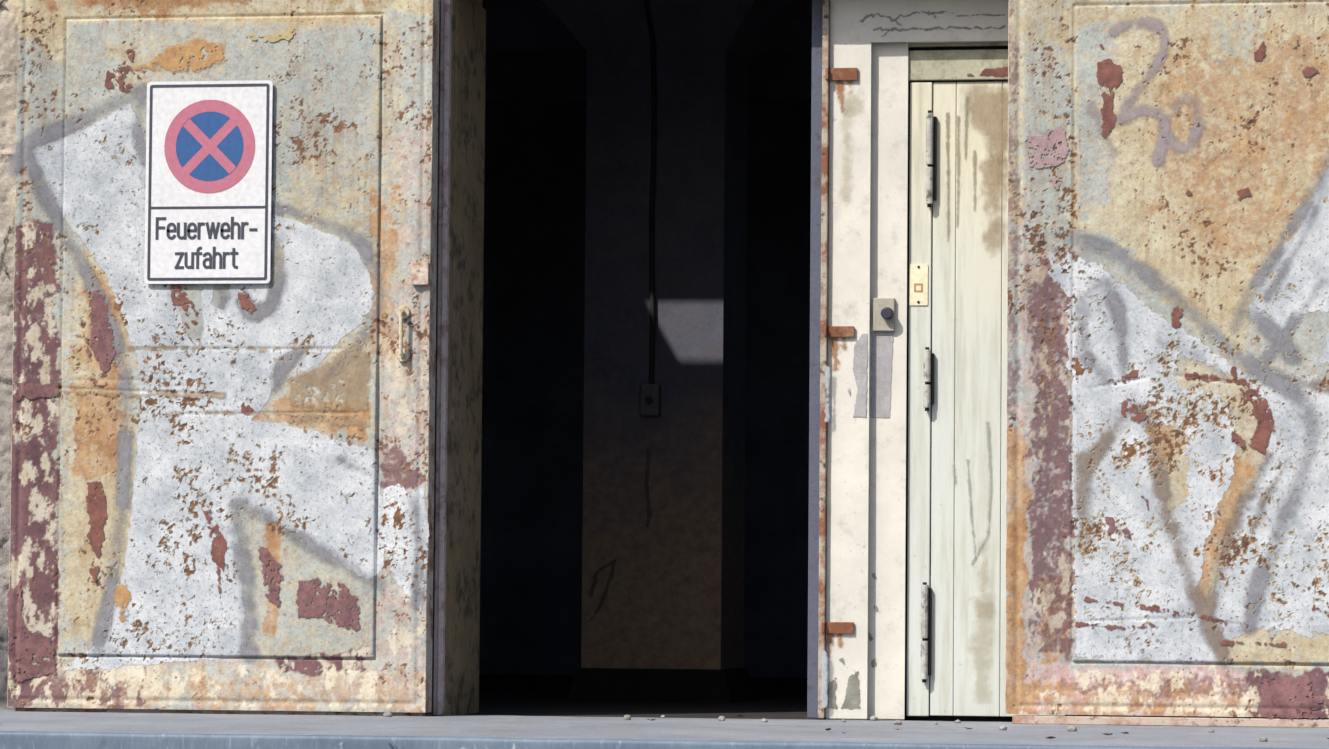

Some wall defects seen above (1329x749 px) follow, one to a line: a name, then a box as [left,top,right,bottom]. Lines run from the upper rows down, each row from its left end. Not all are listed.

crack [860,11,1005,37]
water stain [946,96,976,238]
crack [0,226,11,276]
peeling [85,290,116,375]
rust [127,284,312,352]
rust [818,0,852,718]
rust [1107,369,1148,423]
rust [1185,366,1274,454]
peeling [86,481,107,583]
rust [203,509,229,593]
peeling [6,582,57,682]
peeling [1258,674,1329,720]